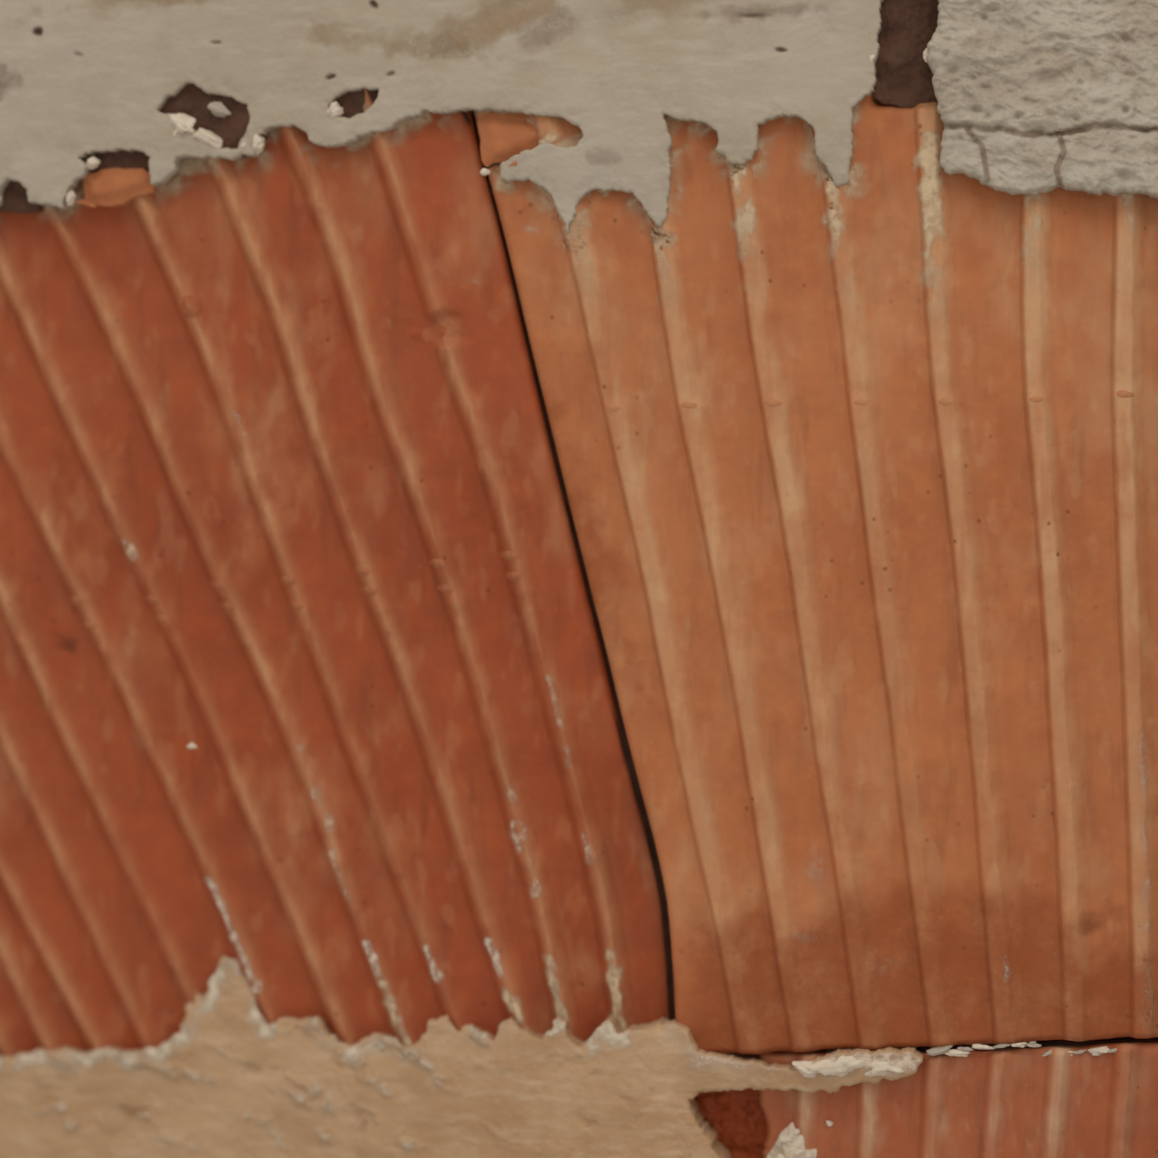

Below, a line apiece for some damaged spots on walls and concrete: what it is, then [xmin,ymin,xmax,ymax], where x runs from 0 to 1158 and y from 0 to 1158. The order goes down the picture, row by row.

spalling [160,84,268,160]
spalling [477,112,538,176]
spalling [66,150,157,208]
spalling [0,180,43,213]
crack [462,111,676,1020]
peeling [943,1041,1042,1057]
peeling [1068,1046,1117,1056]
peeling [792,1061,816,1078]
peeling [864,1060,904,1077]